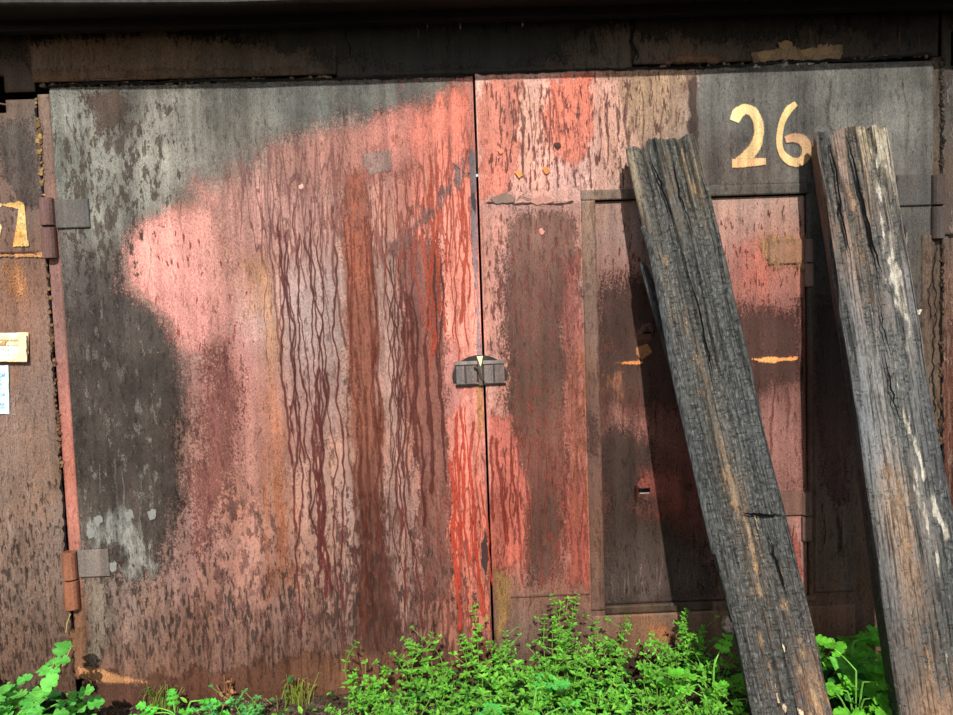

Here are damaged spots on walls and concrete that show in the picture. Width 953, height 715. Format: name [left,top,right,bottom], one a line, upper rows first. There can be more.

leakage [0,114,42,253]
rust [0,252,42,304]
leakage [53,86,187,539]
rust [77,75,590,707]
leakage [84,131,692,692]
leakage [485,71,699,191]
rust [598,267,725,603]
leakage [720,206,802,423]
rust [736,286,804,395]
rust [789,526,802,580]